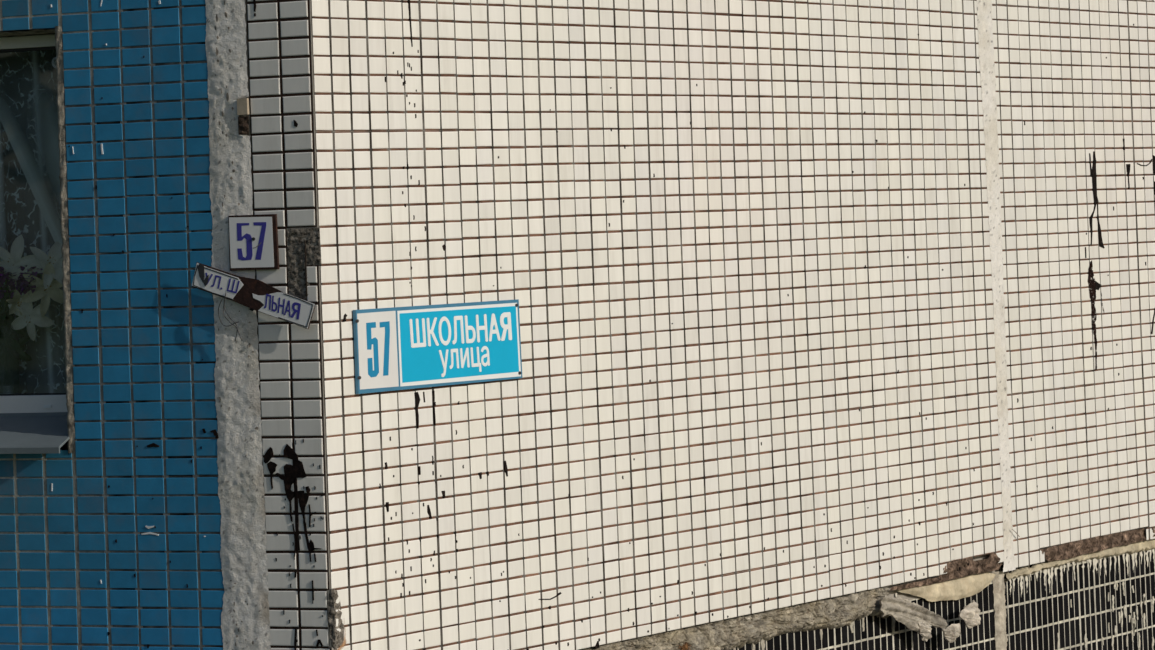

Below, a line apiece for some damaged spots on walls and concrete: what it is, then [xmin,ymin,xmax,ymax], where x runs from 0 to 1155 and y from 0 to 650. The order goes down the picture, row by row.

peeling [286,228,322,300]
damp [1085,151,1105,370]
spalling [1040,526,1155,562]